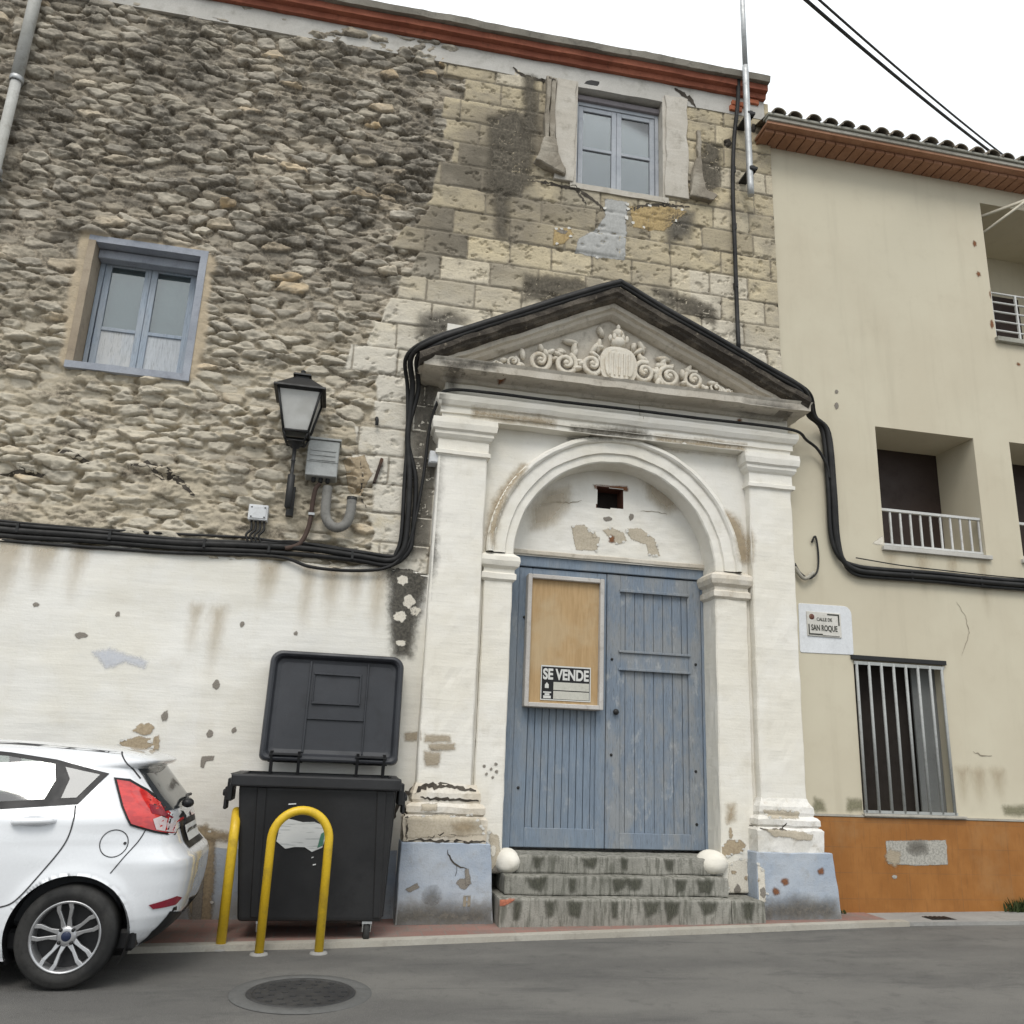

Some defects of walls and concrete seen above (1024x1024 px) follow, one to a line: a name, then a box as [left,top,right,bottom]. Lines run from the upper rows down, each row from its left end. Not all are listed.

damp [488,75,537,237]
crack [532,180,690,211]
spalling [624,203,686,231]
crack [128,460,195,496]
peeling [571,514,660,557]
peeling [116,710,168,750]
crack [394,782,486,876]
peeling [406,803,500,873]
peeling [885,840,948,879]